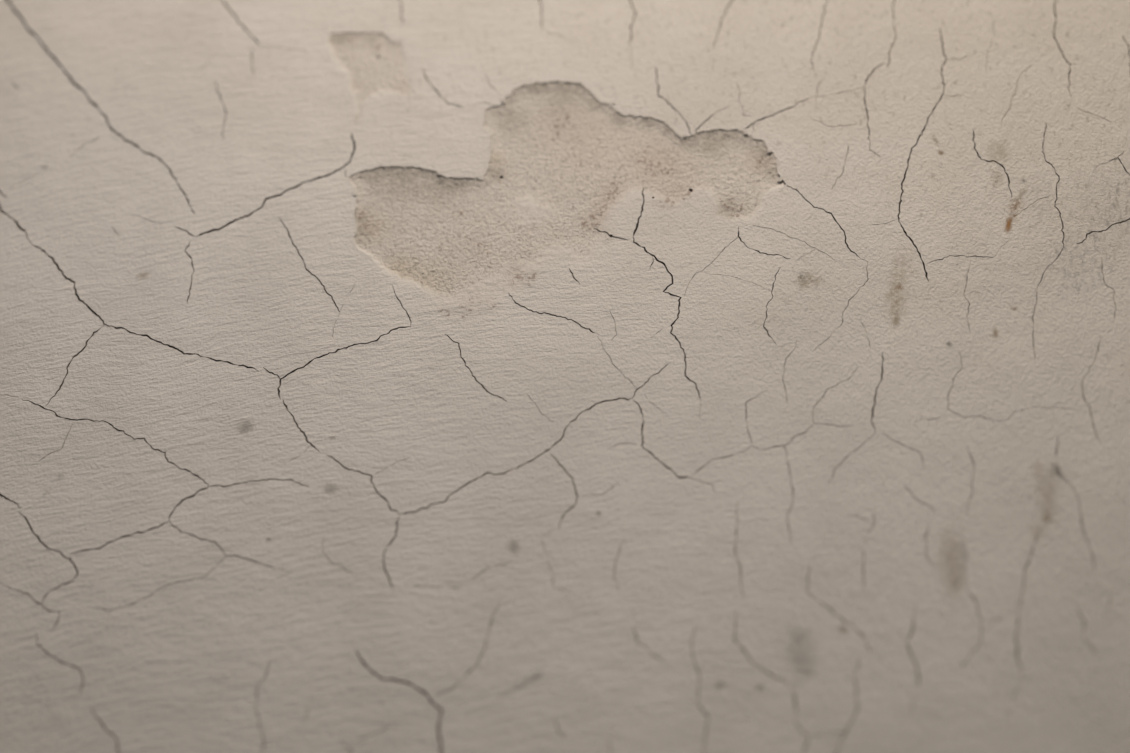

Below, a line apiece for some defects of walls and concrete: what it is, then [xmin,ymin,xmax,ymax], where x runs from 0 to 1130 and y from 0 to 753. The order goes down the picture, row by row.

crack [6,0,356,304]
peeling [324,30,421,132]
crack [421,68,500,107]
peeling [347,80,788,328]
crack [656,0,897,190]
crack [875,21,1130,443]
crack [1053,0,1111,122]
crack [0,173,925,753]
crack [1055,436,1095,572]